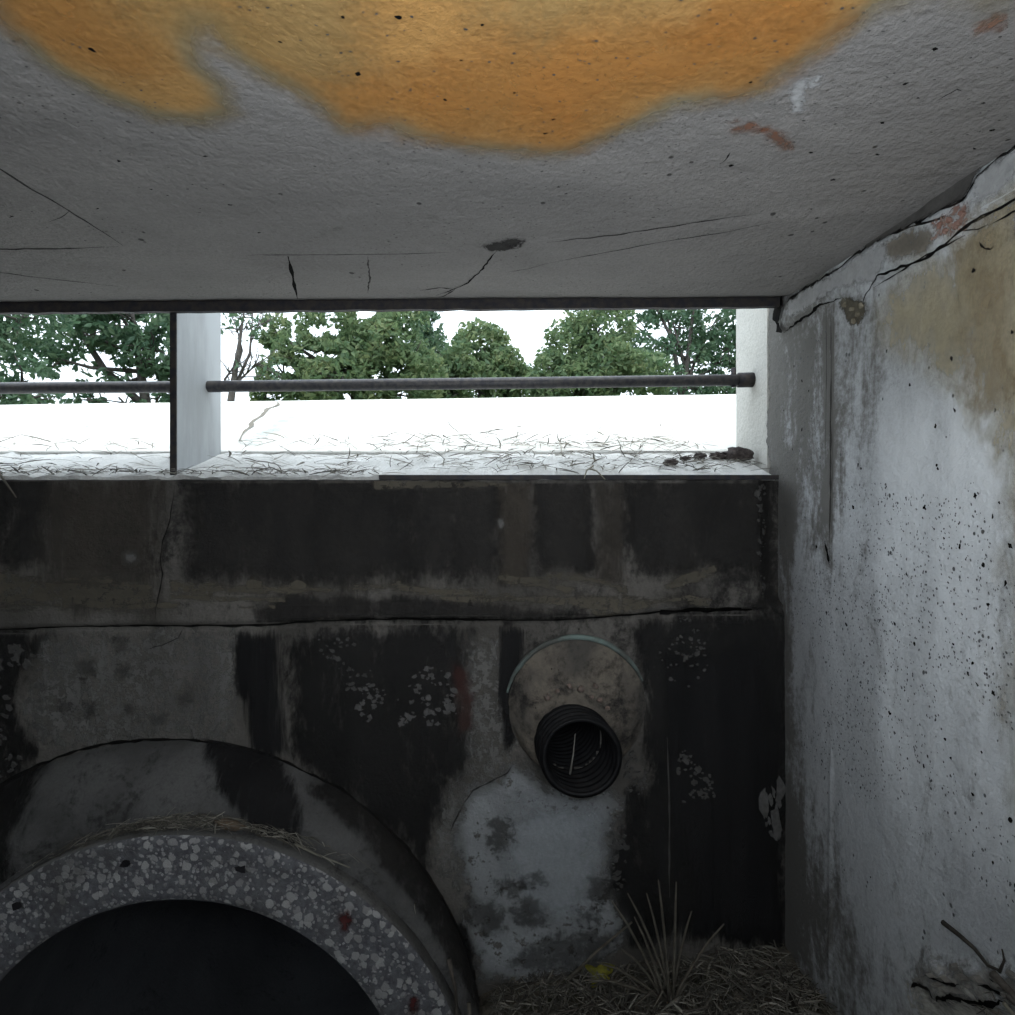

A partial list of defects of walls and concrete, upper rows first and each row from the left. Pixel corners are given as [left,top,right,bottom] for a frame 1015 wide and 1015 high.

rust [0,0,885,154]
crack [0,169,122,245]
crack [287,256,298,299]
crack [421,221,778,297]
crack [772,145,1015,333]
spalling [863,167,982,248]
damp [883,192,1015,454]
crack [0,487,752,649]
damp [0,481,786,1011]